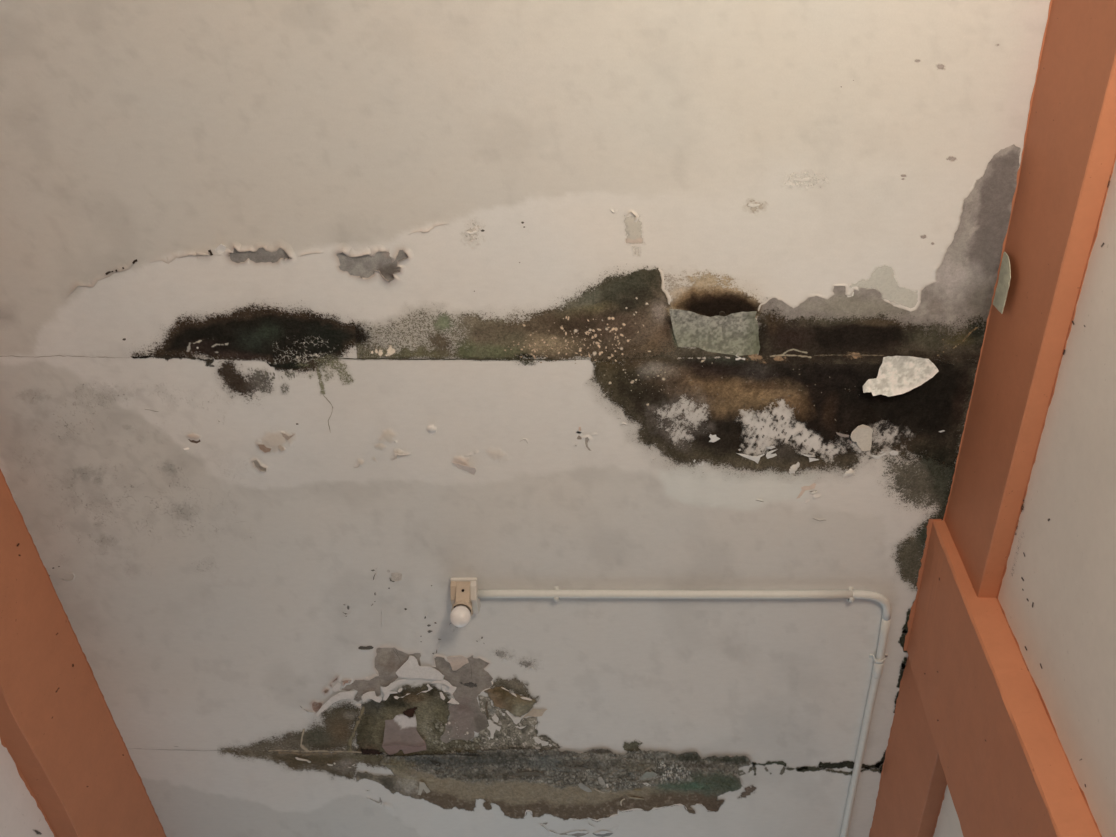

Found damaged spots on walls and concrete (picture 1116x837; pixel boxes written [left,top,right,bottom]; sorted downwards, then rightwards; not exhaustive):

peeling [60,218,450,300]
peeling [609,207,643,255]
spalling [669,141,1021,397]
leakage [131,265,987,713]
peeling [382,714,427,755]
peeling [307,612,537,743]